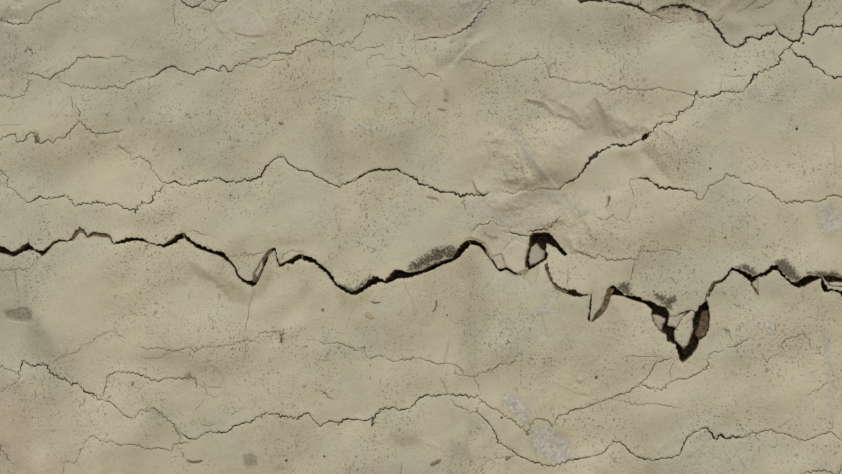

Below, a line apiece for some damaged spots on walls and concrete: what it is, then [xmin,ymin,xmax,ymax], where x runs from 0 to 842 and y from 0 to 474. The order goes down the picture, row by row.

crack [0,0,842,221]
crack [0,213,842,473]
spalling [465,191,577,275]
spalling [646,300,710,363]